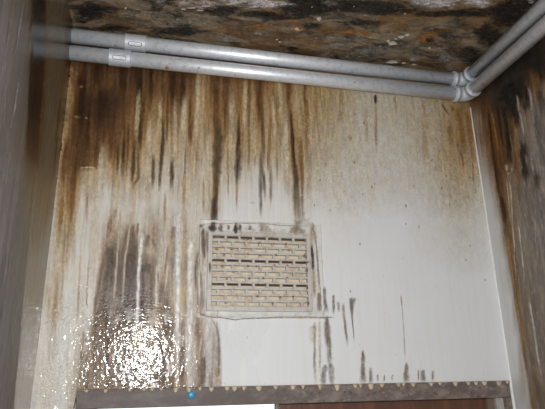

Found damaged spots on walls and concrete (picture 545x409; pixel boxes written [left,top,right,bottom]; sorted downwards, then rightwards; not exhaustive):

leakage [152,0,536,46]
leakage [499,80,538,179]
rust [46,36,545,356]
leakage [505,145,525,281]
leakage [76,211,219,392]
leakage [312,318,332,382]
leakage [311,247,354,339]
leakage [529,302,540,364]